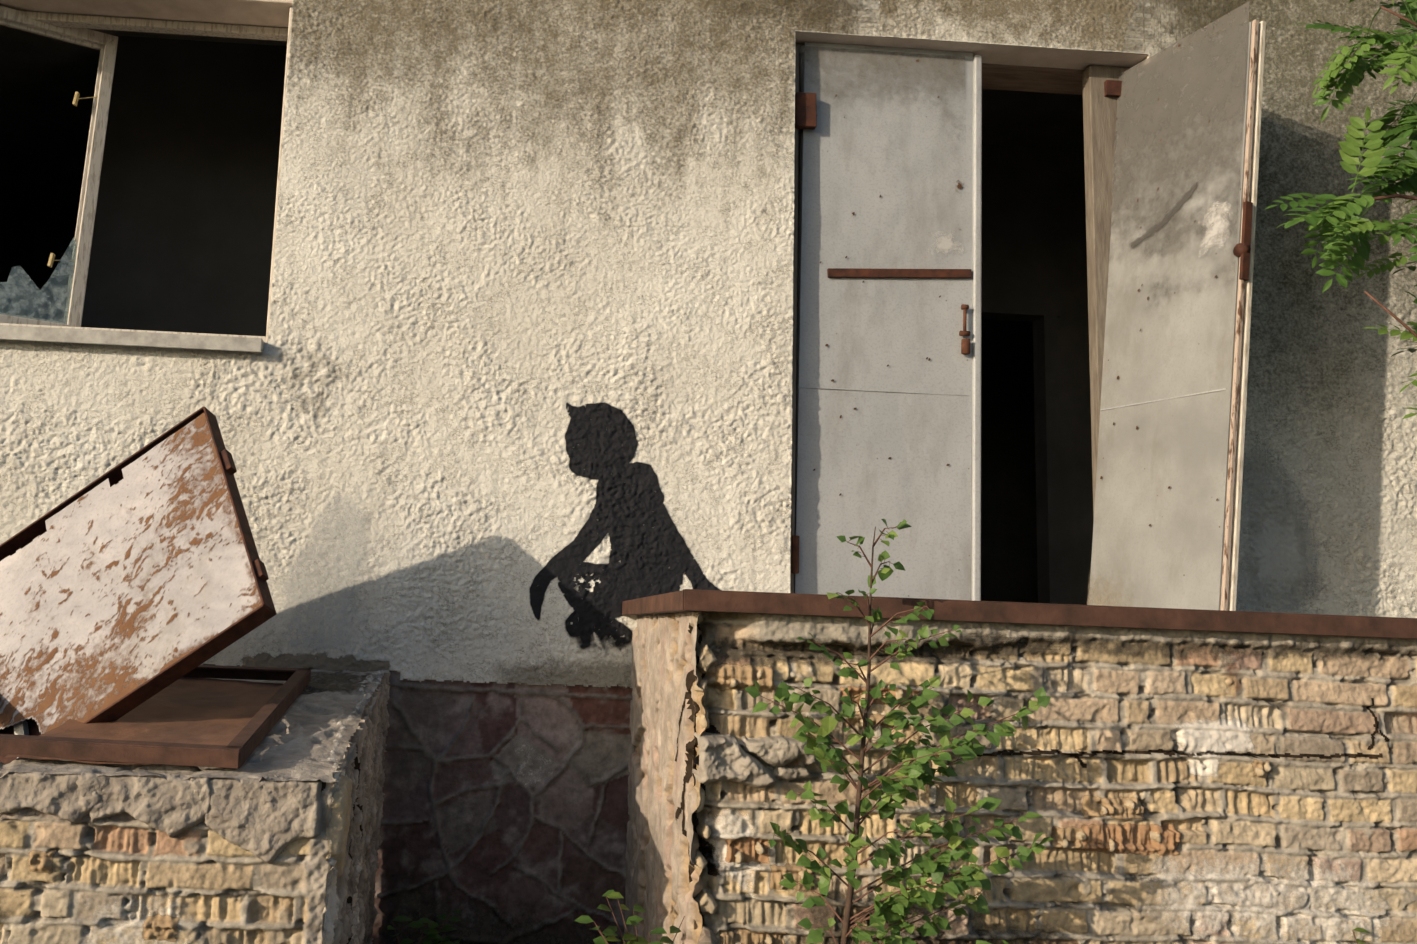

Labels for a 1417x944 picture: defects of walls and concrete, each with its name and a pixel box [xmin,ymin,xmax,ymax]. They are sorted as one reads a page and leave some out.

leakage [289,0,1417,411]
corrosion [0,413,262,734]
spalling [712,664,775,692]
flaking render [692,732,818,788]
leakage [1171,718,1254,777]
flaking render [0,769,363,944]
spalling [725,838,814,891]
spalling [720,929,786,944]